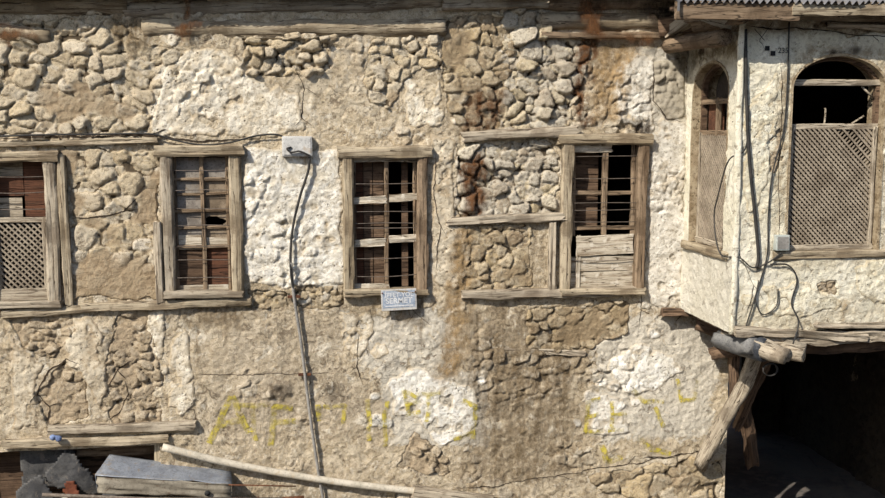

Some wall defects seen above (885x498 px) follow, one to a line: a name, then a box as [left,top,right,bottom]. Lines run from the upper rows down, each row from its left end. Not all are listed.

corrosion [574,0,605,127]
spalling [0,14,391,438]
corrosion [459,154,487,217]
spalling [363,8,590,311]
water stain [443,230,472,375]
crack [30,358,80,426]
crack [108,360,136,419]
peeling [369,367,487,476]
crack [475,451,698,488]
spalling [589,451,725,498]